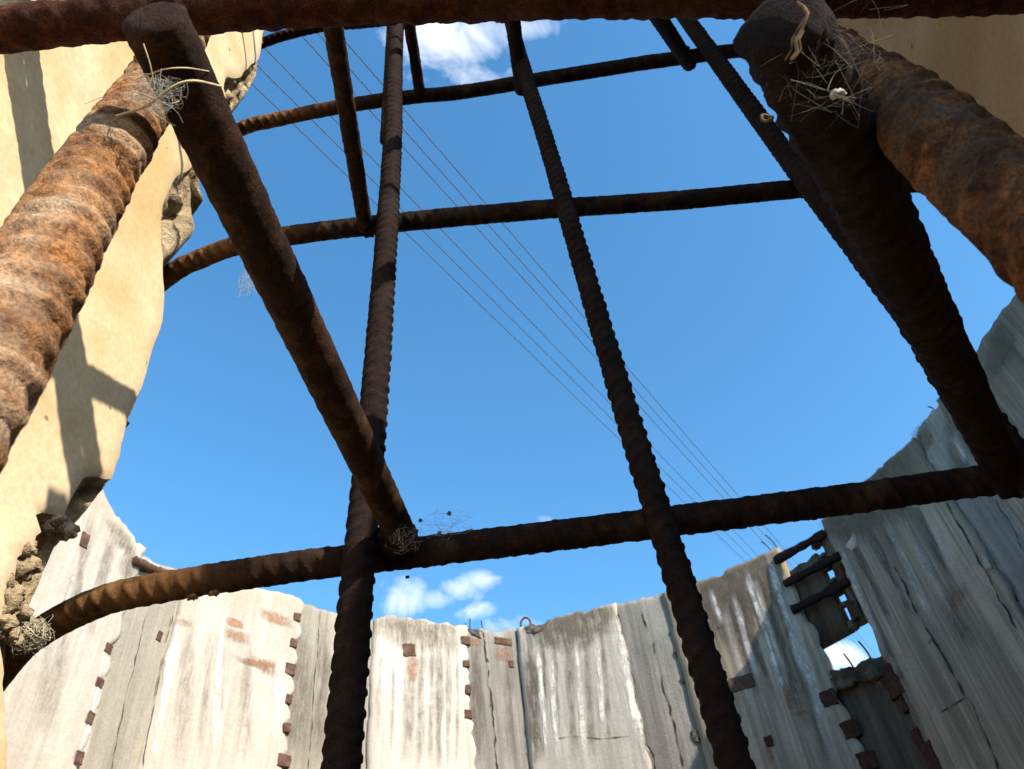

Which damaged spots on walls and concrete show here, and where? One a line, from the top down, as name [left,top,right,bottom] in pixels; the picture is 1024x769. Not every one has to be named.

spalling [574,17,895,322]
spalling [671,0,1024,536]
spalling [0,0,766,769]
water stain [156,625,179,729]
water stain [212,623,224,748]
rust [228,619,245,642]
water stain [272,658,307,737]
water stain [525,606,645,758]
crack [894,567,998,769]
crack [946,502,1017,630]